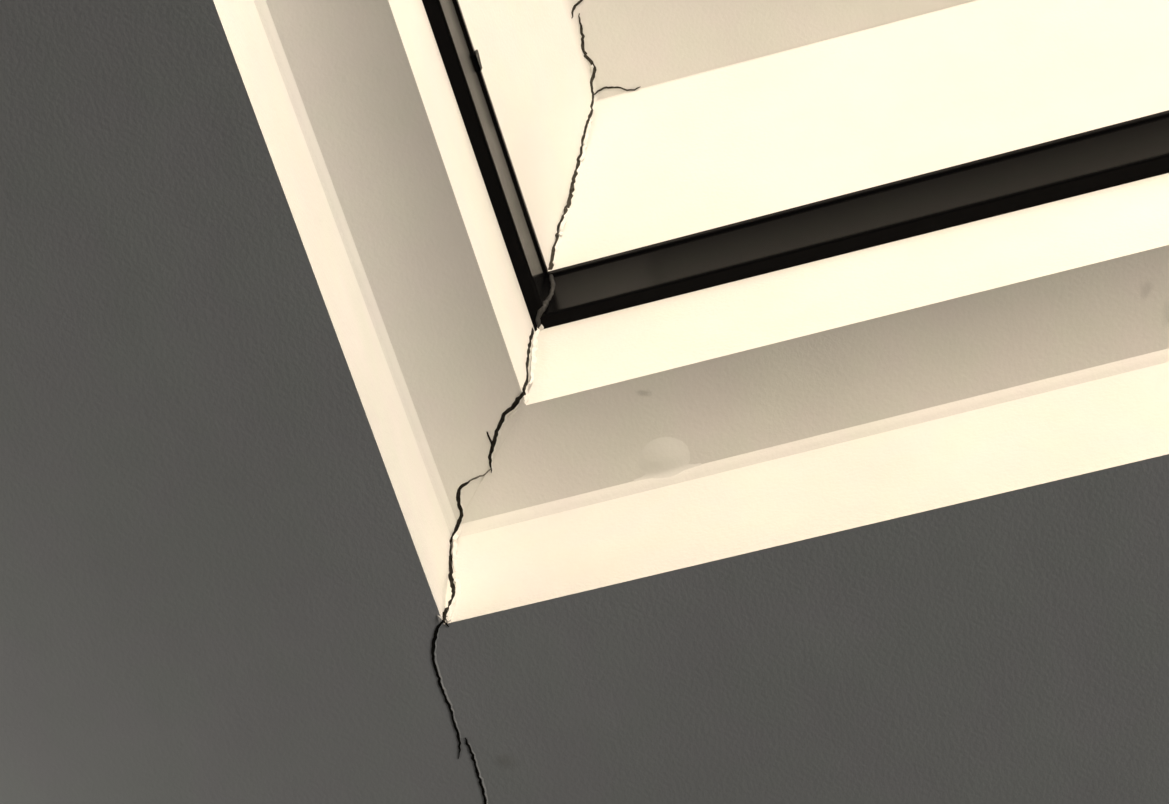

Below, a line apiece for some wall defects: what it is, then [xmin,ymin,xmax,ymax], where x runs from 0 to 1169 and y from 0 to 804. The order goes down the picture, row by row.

crack [548,0,640,270]
crack [431,328,540,804]